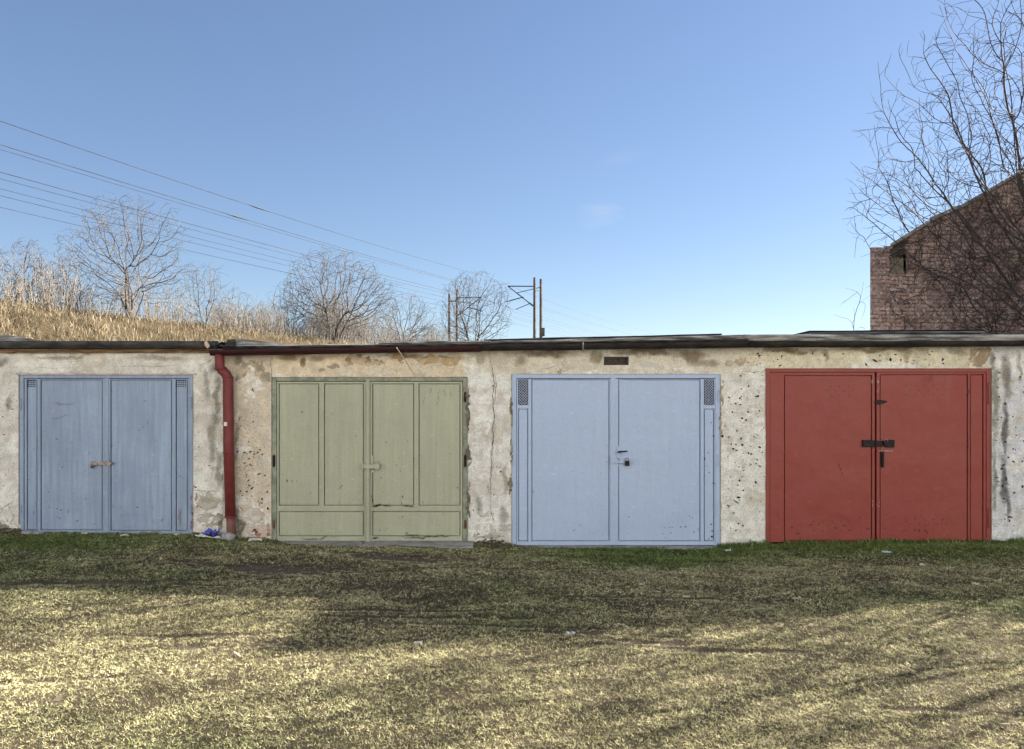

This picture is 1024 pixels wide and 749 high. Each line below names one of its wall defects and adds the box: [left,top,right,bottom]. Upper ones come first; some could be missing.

flaking render [234,360,271,427]
crack [479,352,505,534]
leakage [991,355,1023,446]
flaking render [235,441,271,539]
leakage [993,465,1010,513]